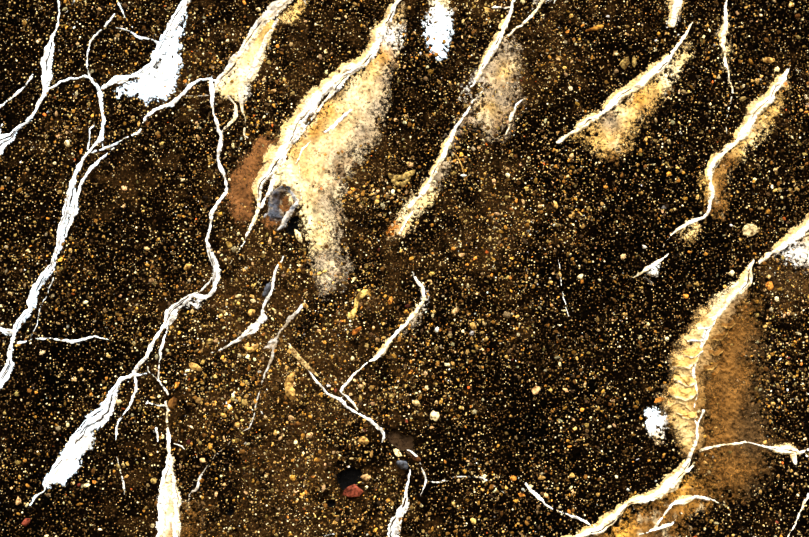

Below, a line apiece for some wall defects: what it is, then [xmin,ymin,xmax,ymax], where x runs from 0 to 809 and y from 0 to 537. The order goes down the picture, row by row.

leakage [112,12,187,106]
leakage [269,2,407,300]
leakage [422,0,454,61]
crack [398,0,544,234]
crack [556,0,693,144]
crack [632,0,789,278]
leakage [43,416,99,488]
crack [0,0,401,537]
crack [308,272,426,441]
crack [387,450,504,537]
crack [525,213,809,537]
leakage [596,288,775,537]